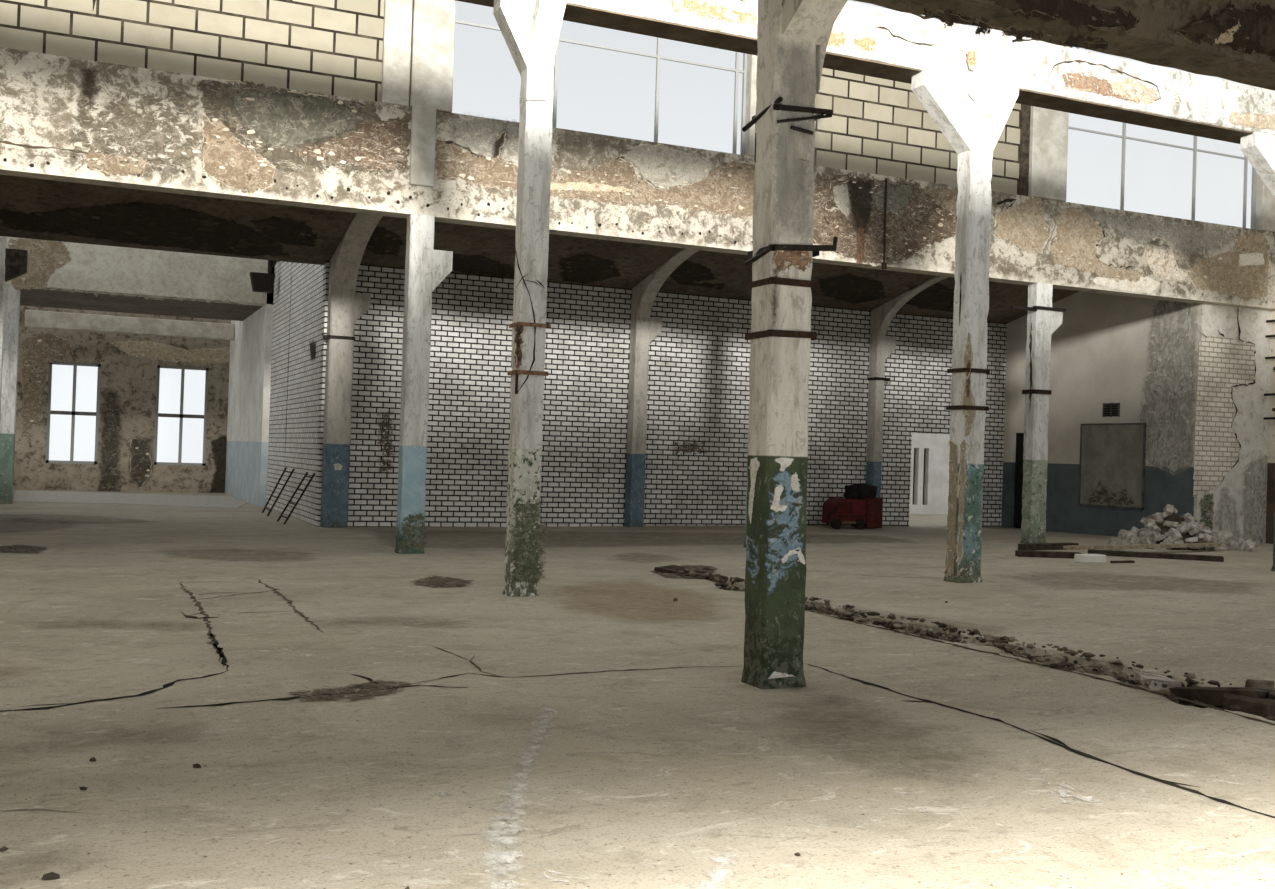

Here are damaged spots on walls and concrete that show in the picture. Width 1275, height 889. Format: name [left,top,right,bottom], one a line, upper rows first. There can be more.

peeling [70,79,411,194]
peeling [907,0,1140,72]
spalling [1059,71,1159,105]
peeling [1175,1,1275,62]
peeling [772,171,958,305]
peeling [906,282,954,313]
peeling [1093,232,1269,301]
peeling [1193,335,1255,497]
peeling [745,457,805,595]
crack [0,580,734,712]
crack [818,613,1275,725]
crack [808,664,1275,818]